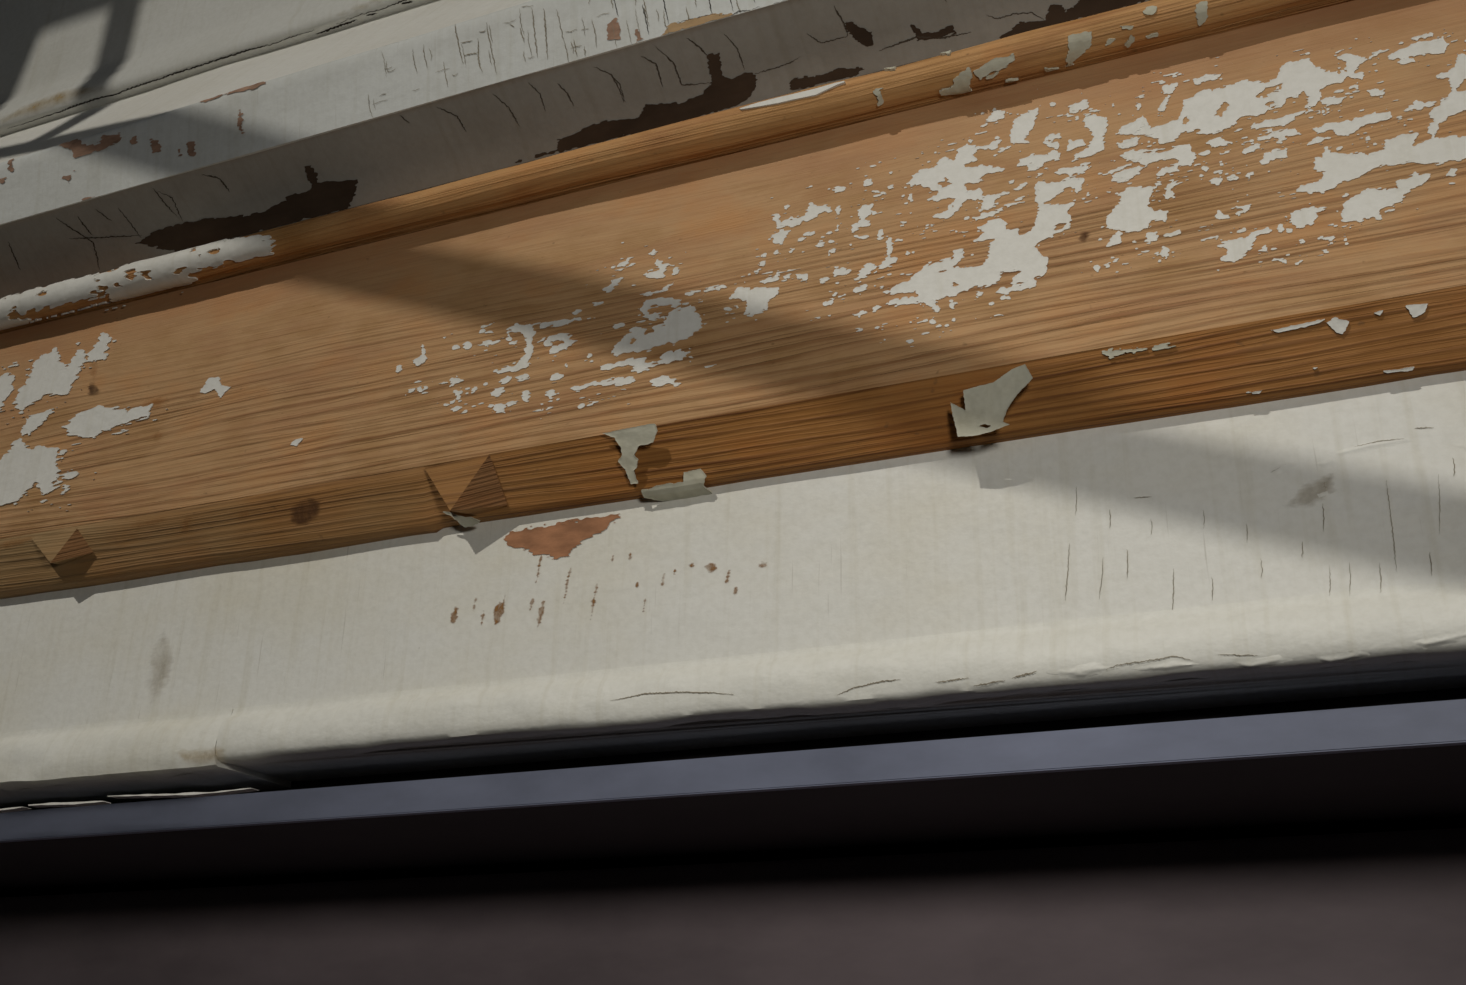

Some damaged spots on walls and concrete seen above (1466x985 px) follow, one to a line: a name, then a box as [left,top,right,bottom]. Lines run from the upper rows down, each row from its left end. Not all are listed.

crack [14,0,412,127]
crack [368,0,1044,130]
peeling [939,0,1159,96]
crack [56,210,139,269]
peeling [0,165,358,330]
peeling [396,29,1466,414]
peeling [0,332,168,512]
peeling [950,364,1033,437]
peeling [504,514,620,559]
crack [1065,488,1152,599]
crack [1301,459,1455,596]
rust [481,602,504,624]